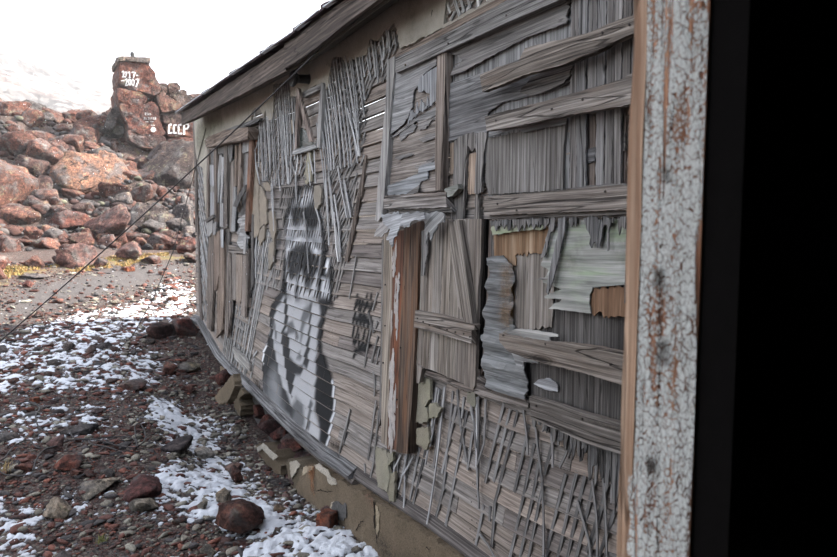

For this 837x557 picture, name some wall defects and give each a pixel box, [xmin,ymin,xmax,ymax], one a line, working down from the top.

spalling [447,0,488,21]
spalling [222,29,437,379]
spalling [363,211,626,557]
peeling [627,0,709,557]